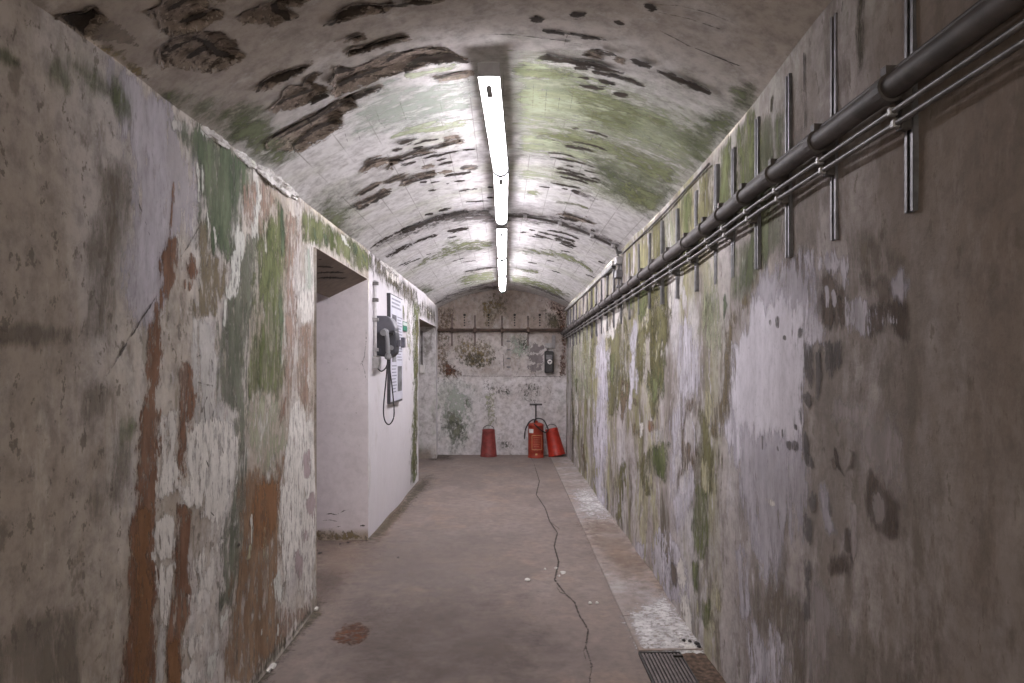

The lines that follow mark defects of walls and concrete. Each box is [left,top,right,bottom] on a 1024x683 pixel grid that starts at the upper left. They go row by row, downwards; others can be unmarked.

spalling [145,0,246,74]
spalling [252,33,475,153]
crack [113,299,155,366]
rust [119,182,199,683]
damp [192,176,275,326]
damp [332,622,369,645]
crack [531,458,593,683]
damp [623,272,703,655]
damp [711,269,762,439]
damp [735,513,811,683]
damp [803,492,831,544]
damp [784,236,908,469]